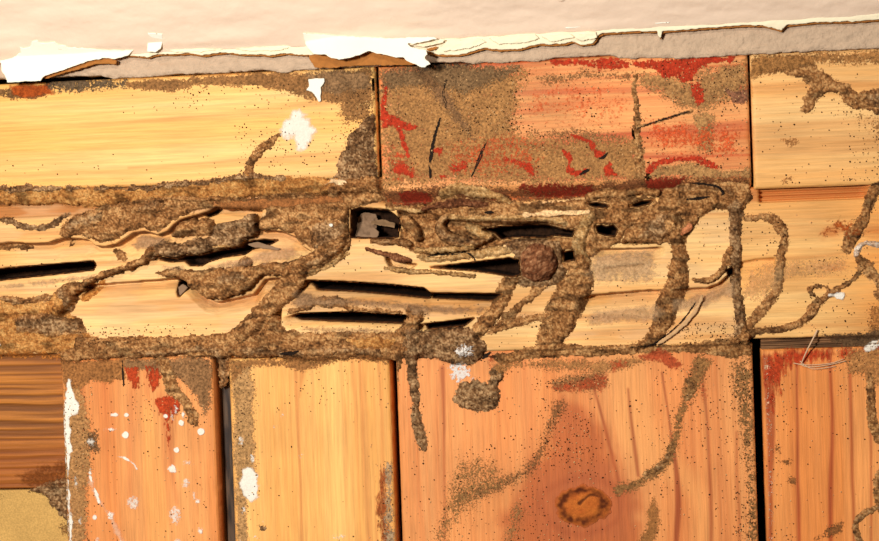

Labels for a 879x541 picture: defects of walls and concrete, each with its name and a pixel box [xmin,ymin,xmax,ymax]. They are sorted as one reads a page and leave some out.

spalling [0,13,879,102]
crack [428,80,447,178]
crack [471,143,487,177]